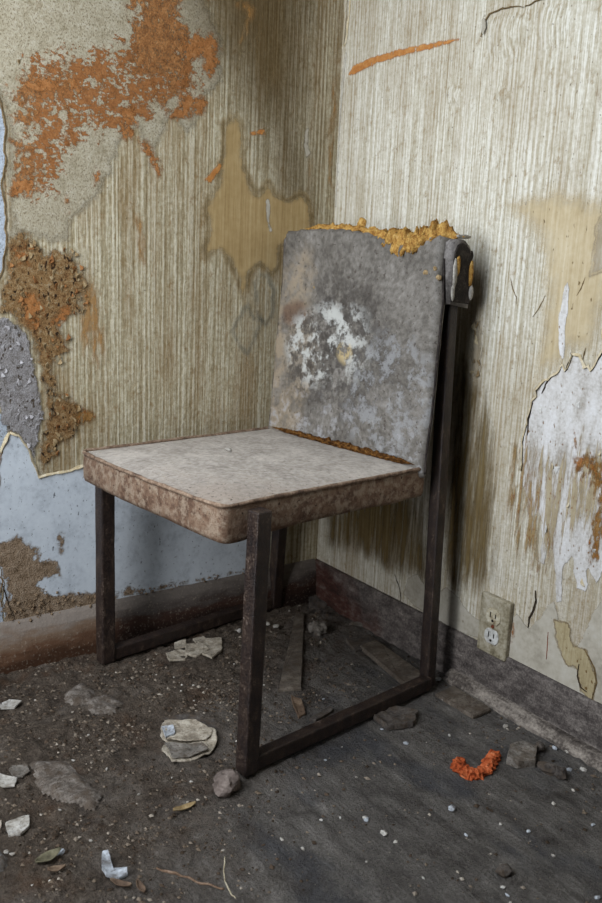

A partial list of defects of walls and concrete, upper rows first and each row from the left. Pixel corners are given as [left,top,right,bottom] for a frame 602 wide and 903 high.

corrosion [349,39,459,75]
crack [480,0,540,37]
water stain [202,118,314,292]
peeling [0,0,222,623]
peeling [509,282,602,704]
crack [0,568,15,619]
peeling [115,496,247,600]